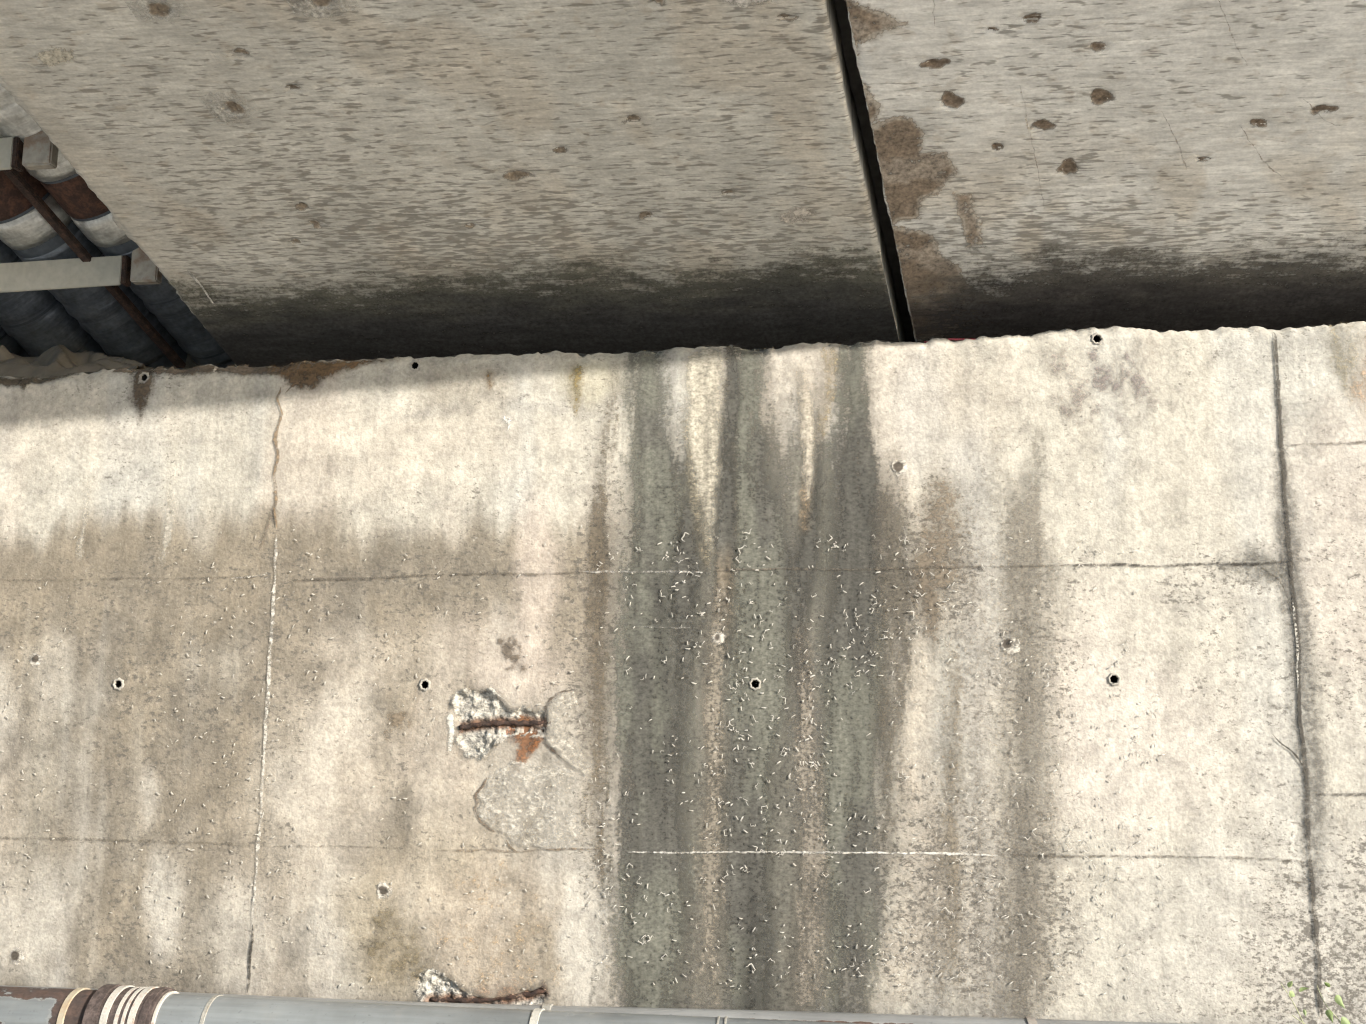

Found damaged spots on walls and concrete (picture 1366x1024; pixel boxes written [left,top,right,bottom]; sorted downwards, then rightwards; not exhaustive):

crack [259,380,303,550]
water stain [1052,351,1150,415]
water stain [909,233,1366,389]
water stain [114,248,1058,1017]
peeling [597,529,1061,909]
crack [1062,332,1323,1016]
water stain [1219,399,1327,891]
spalling [452,687,1130,1000]
peeling [1004,746,1168,906]
crack [246,924,254,992]
spalling [416,968,548,1005]